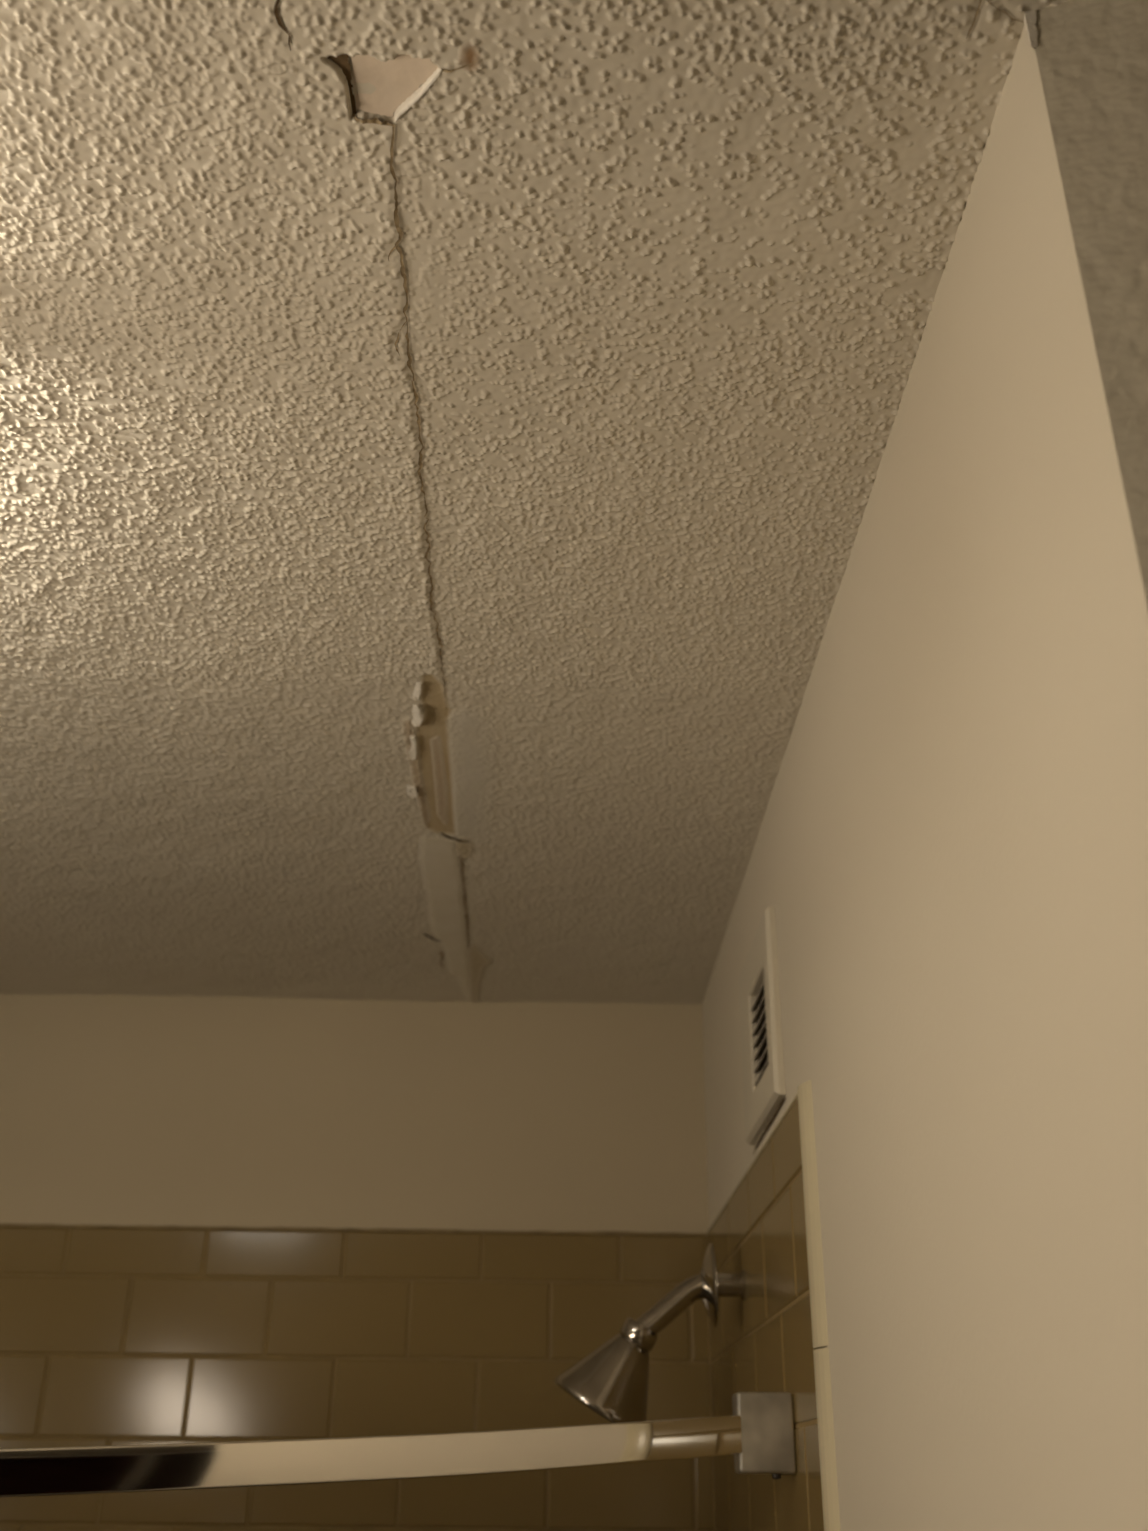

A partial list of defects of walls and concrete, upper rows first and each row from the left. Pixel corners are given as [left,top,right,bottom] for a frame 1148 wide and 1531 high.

crack [274,0,291,51]
spalling [326,54,442,126]
crack [388,126,446,687]